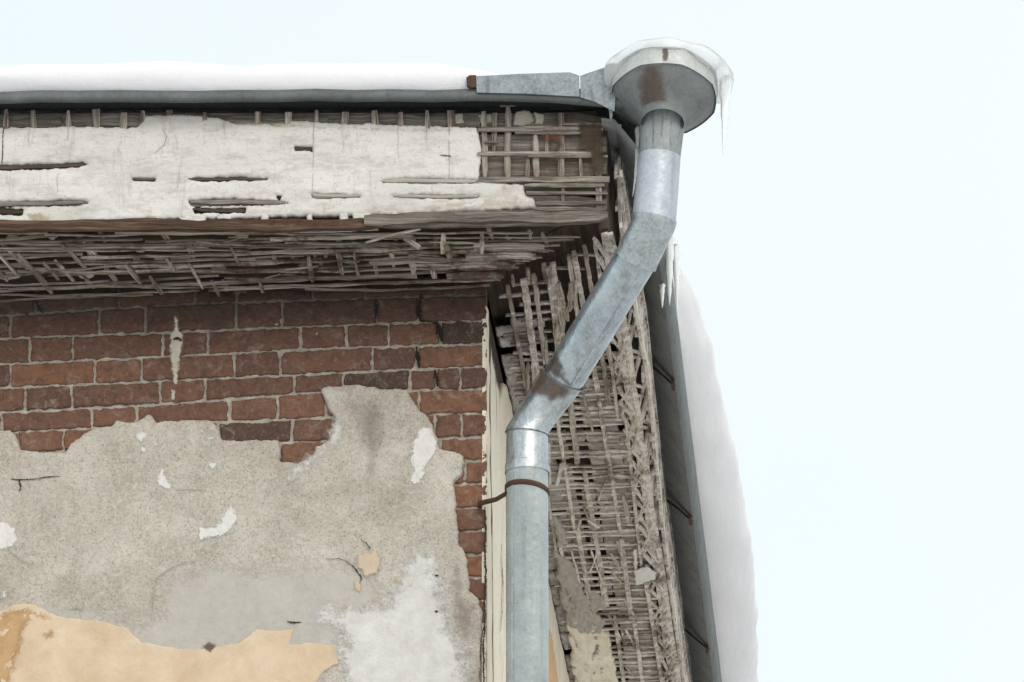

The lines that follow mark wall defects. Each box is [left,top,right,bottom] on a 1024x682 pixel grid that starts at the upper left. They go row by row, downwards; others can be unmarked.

flaking render [382,105,610,211]
crack [13,476,59,491]
flaking render [0,275,503,682]
crack [326,540,371,582]
flaking render [548,515,618,682]
flaking render [634,566,656,585]